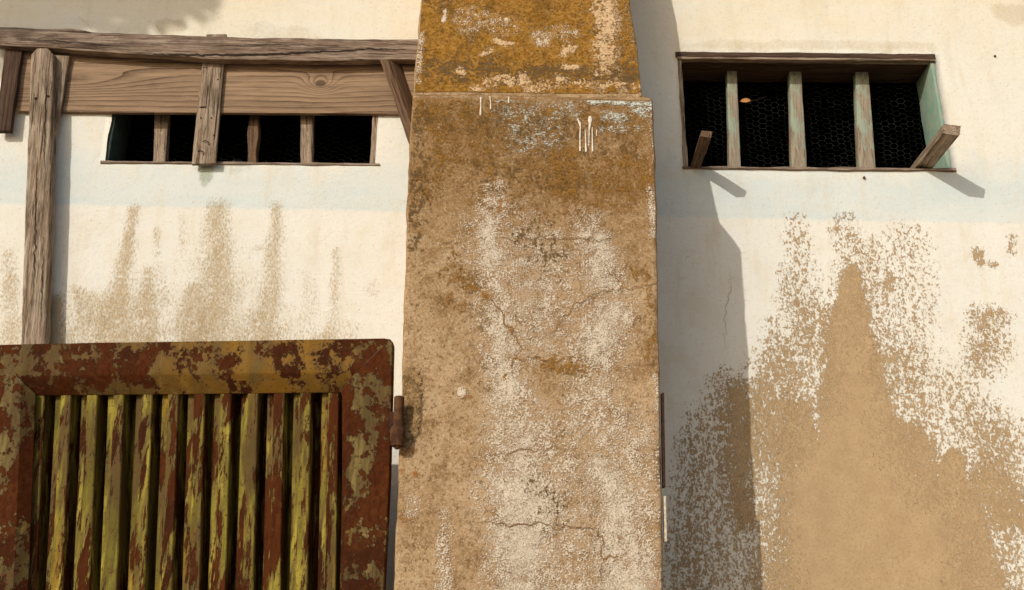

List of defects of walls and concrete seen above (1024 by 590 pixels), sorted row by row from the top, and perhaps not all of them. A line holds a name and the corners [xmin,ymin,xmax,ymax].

leakage [407,96,645,254]
leakage [50,198,287,344]
leakage [505,210,577,281]
crack [460,236,659,369]
crack [467,521,622,587]
leakage [524,468,572,531]